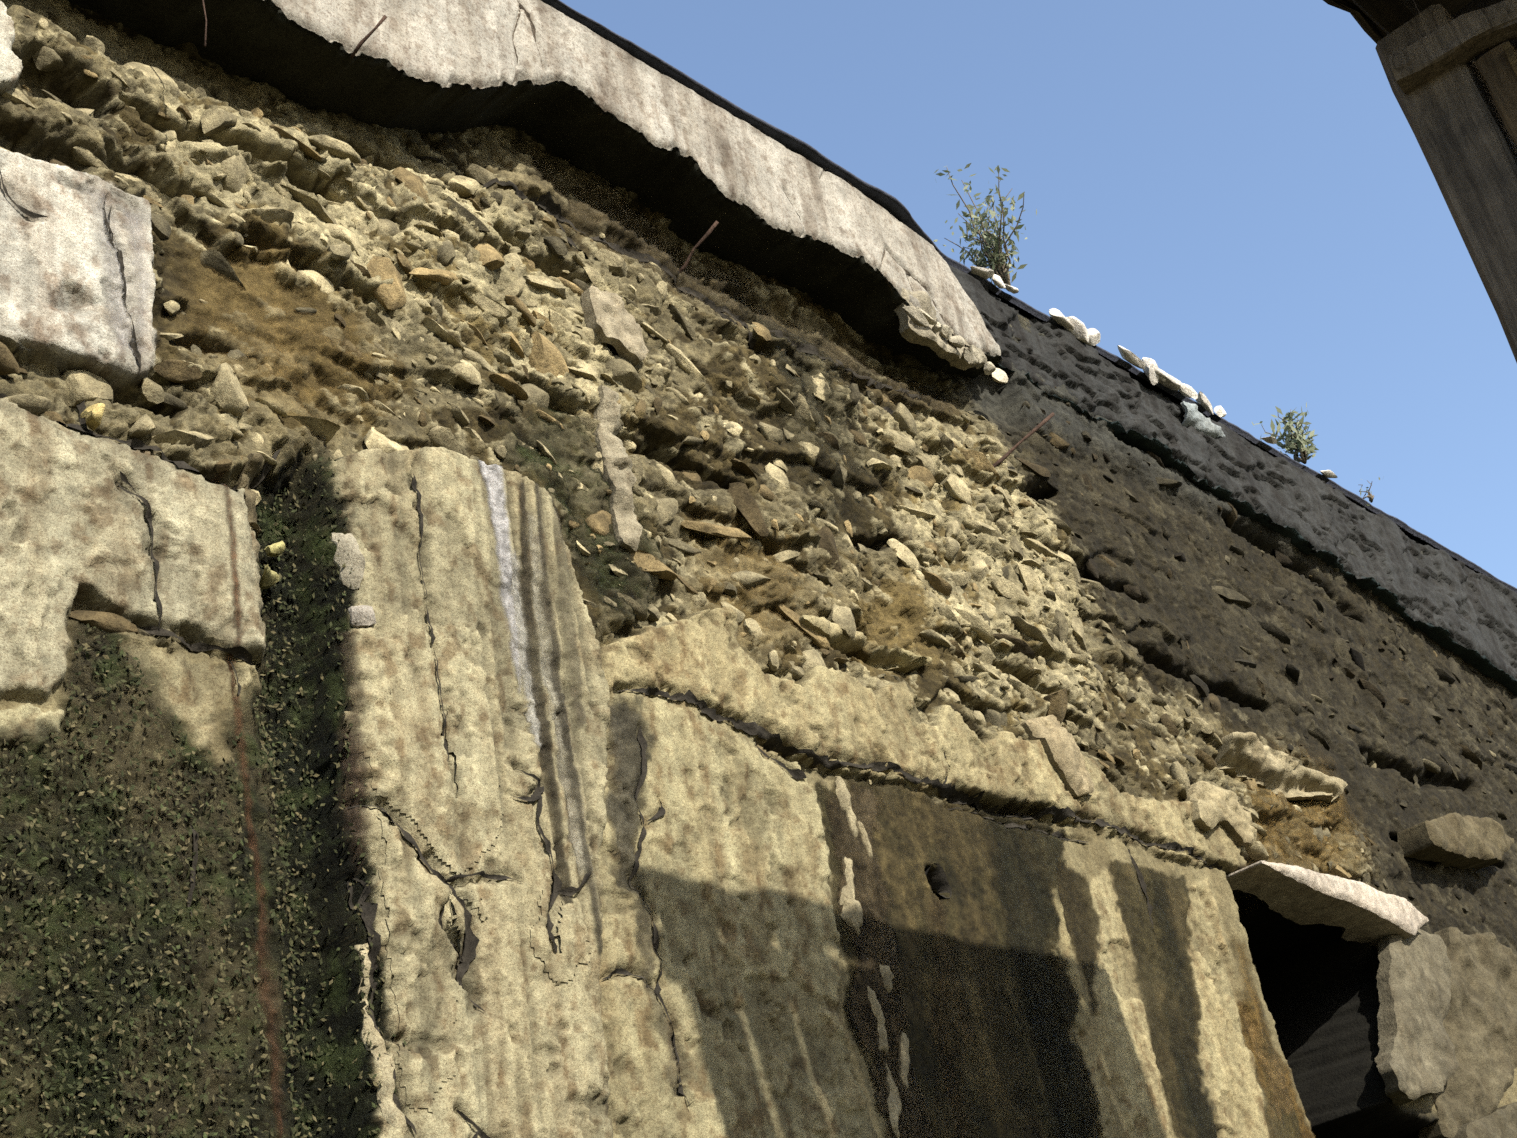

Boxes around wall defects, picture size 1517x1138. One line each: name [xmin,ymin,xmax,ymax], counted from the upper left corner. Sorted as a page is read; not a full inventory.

crack [102,195,141,374]
peeling [581,286,649,367]
spalling [894,288,1008,383]
crack [38,400,281,695]
rust [224,484,267,977]
peeling [591,384,643,553]
peeling [799,615,868,654]
crack [347,878,417,1134]
crack [345,769,591,1011]
crack [602,687,1223,1109]
damp [815,778,1101,1138]
spalling [1232,890,1380,1014]